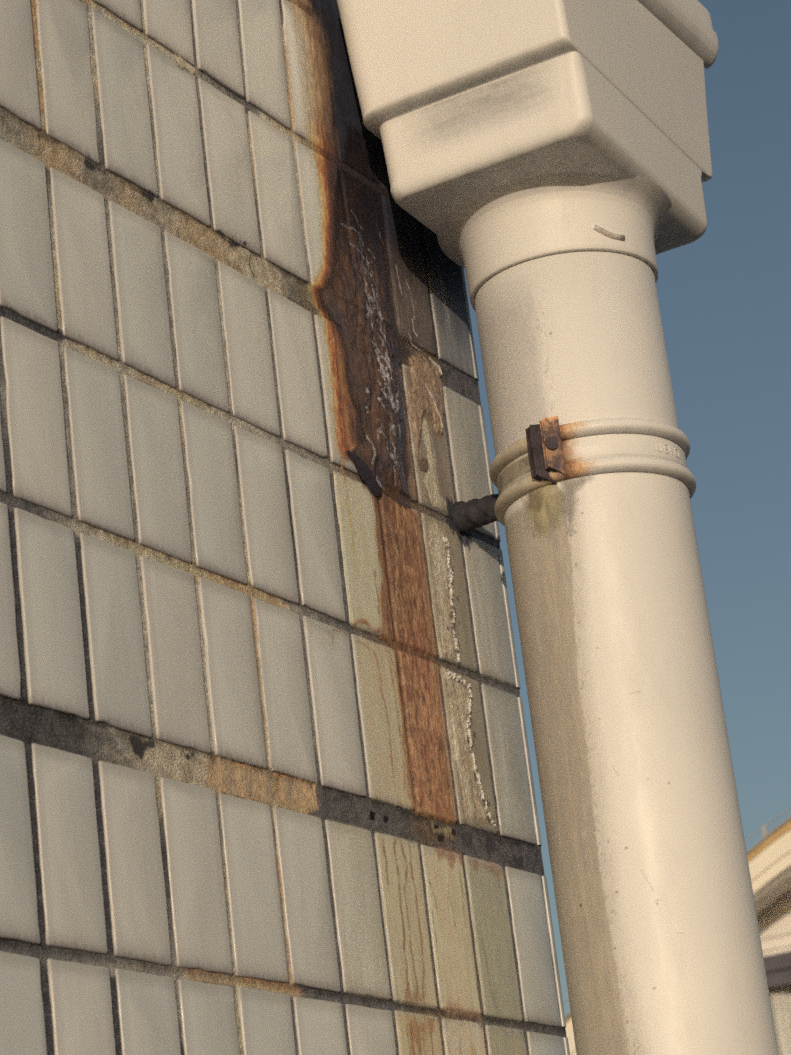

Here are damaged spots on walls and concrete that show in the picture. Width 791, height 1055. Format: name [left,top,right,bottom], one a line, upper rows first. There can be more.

corrosion [213,756,317,812]
corrosion [289,0,405,473]
leakage [311,0,464,807]
corrosion [352,418,456,823]
corrosion [551,423,585,482]